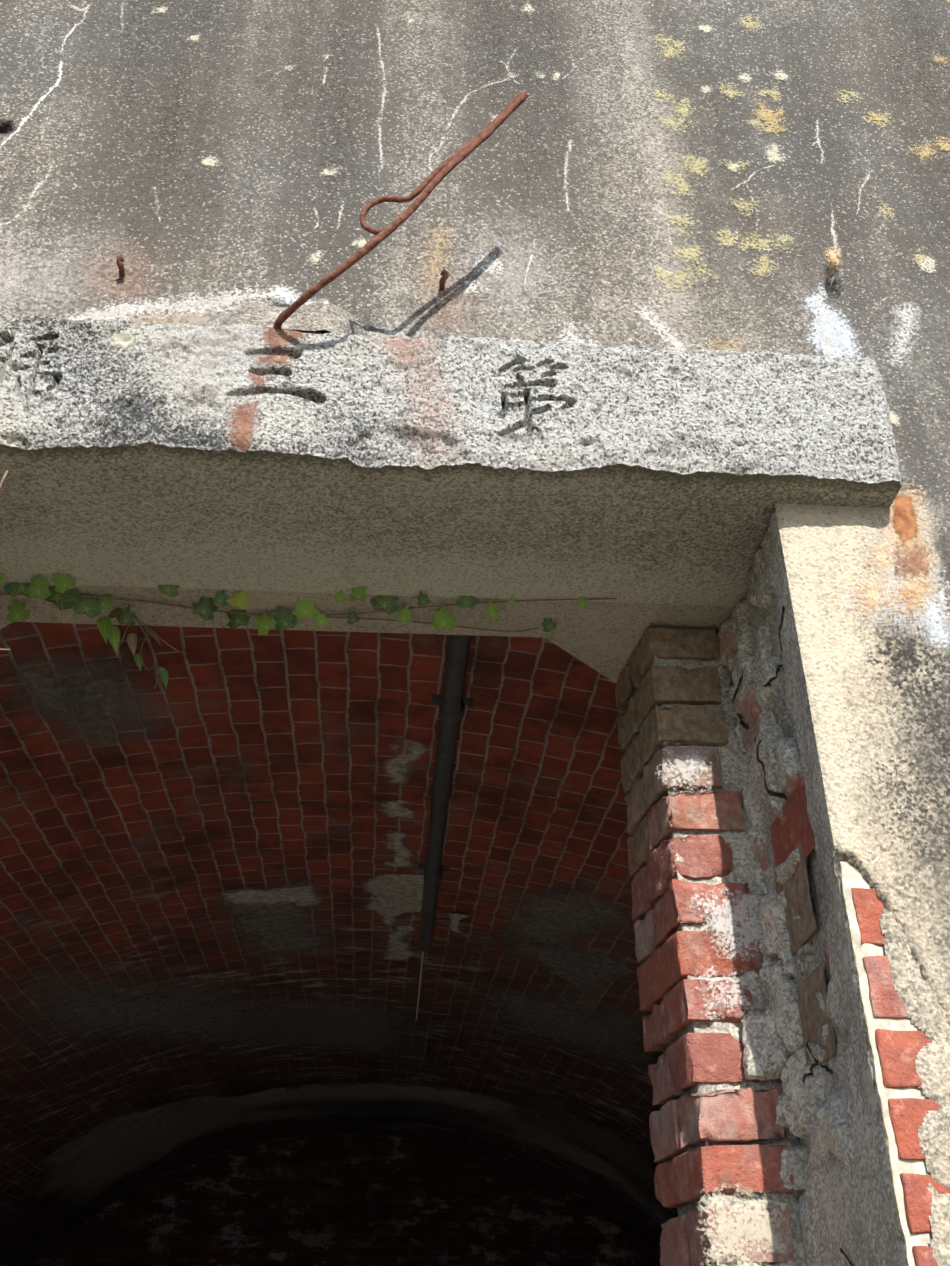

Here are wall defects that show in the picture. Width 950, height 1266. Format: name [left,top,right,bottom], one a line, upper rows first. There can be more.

crack [0,5,90,149]
water stain [61,285,329,321]
rust [227,327,305,451]
water stain [465,254,503,293]
water stain [635,303,686,352]
water stain [804,286,861,359]
water stain [888,304,919,365]
rust [851,489,939,618]
crack [732,606,788,800]
spalling [770,776,816,956]
spalling [796,962,836,1066]
spalling [831,845,950,1266]